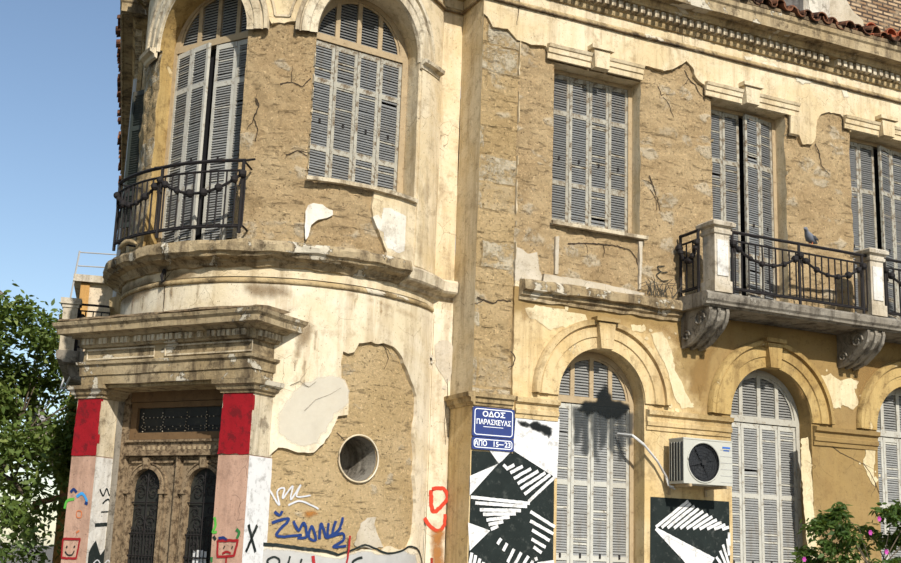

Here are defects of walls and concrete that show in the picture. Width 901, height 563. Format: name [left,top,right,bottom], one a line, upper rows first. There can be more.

flaking render [129,51,163,252]
crack [248,95,259,142]
crack [280,65,311,87]
flaking render [232,19,385,255]
flaking render [472,16,713,395]
crack [642,175,660,211]
crack [658,70,705,118]
flaking render [784,113,855,313]
crack [471,296,511,305]
peeling [631,324,694,412]
peeling [821,369,861,410]
flaking render [267,342,414,554]